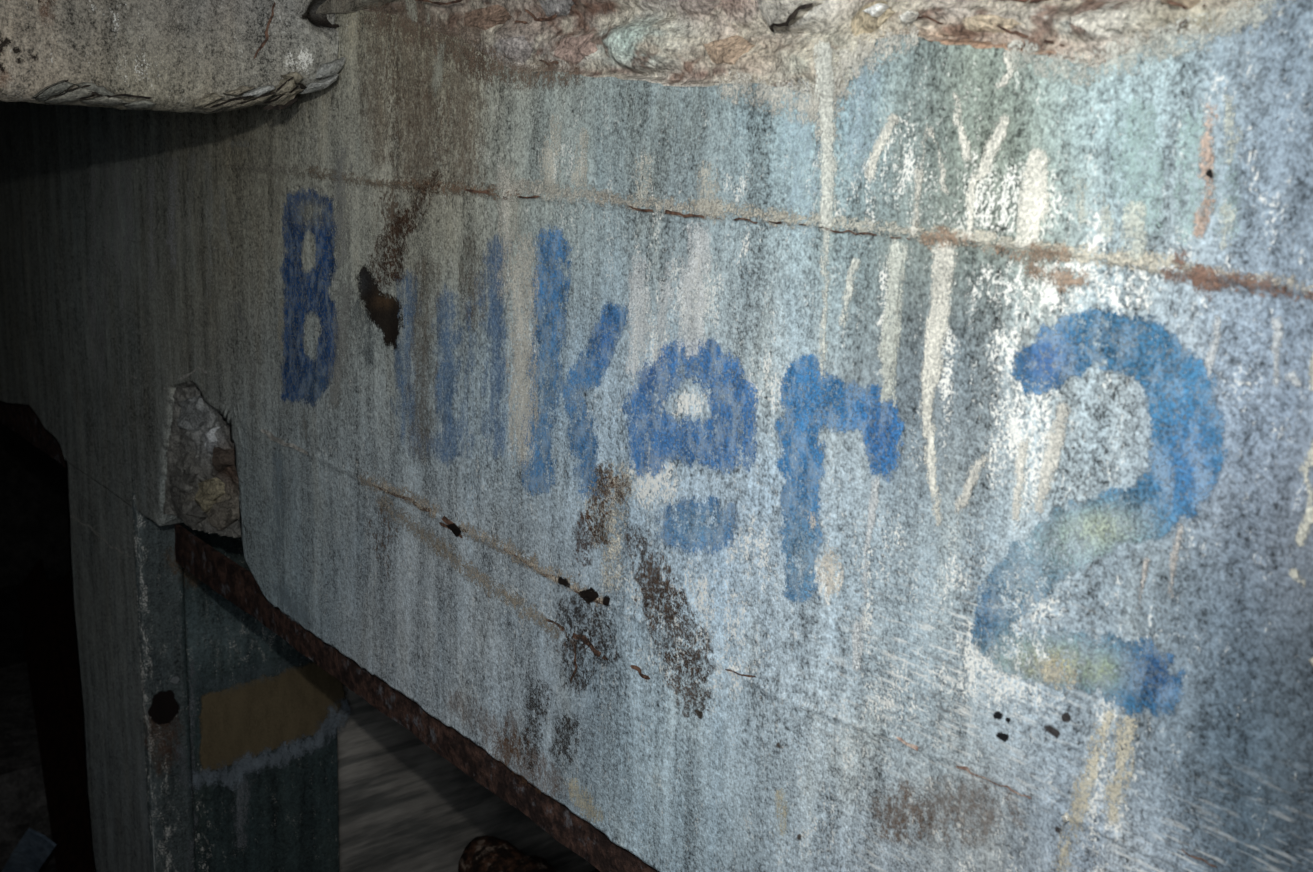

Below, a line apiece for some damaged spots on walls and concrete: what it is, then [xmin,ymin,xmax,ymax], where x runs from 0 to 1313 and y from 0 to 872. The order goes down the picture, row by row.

spalling [364,0,1262,99]
hole [355,265,404,349]
crack [231,161,1313,297]
efflorescence [878,126,949,407]
efflorescence [920,93,1009,526]
efflorescence [1014,148,1049,249]
water stain [1271,316,1313,391]
spalling [163,382,241,538]
crack [374,485,468,538]
water stain [1296,443,1313,547]
crack [504,548,604,605]
crack [546,619,650,684]